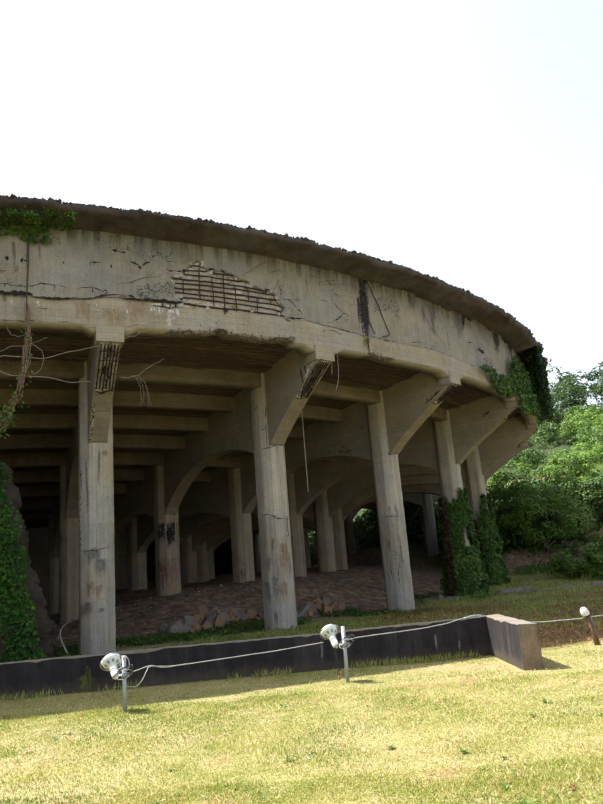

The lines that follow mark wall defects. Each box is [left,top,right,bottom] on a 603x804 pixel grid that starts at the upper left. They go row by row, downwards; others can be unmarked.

crack [0,258,182,294]
spalling [137,261,284,317]
spalling [165,323,296,345]
crack [237,262,352,334]
leakage [357,279,370,351]
spalling [95,341,120,394]
spalling [296,359,329,402]
leakage [157,522,177,546]